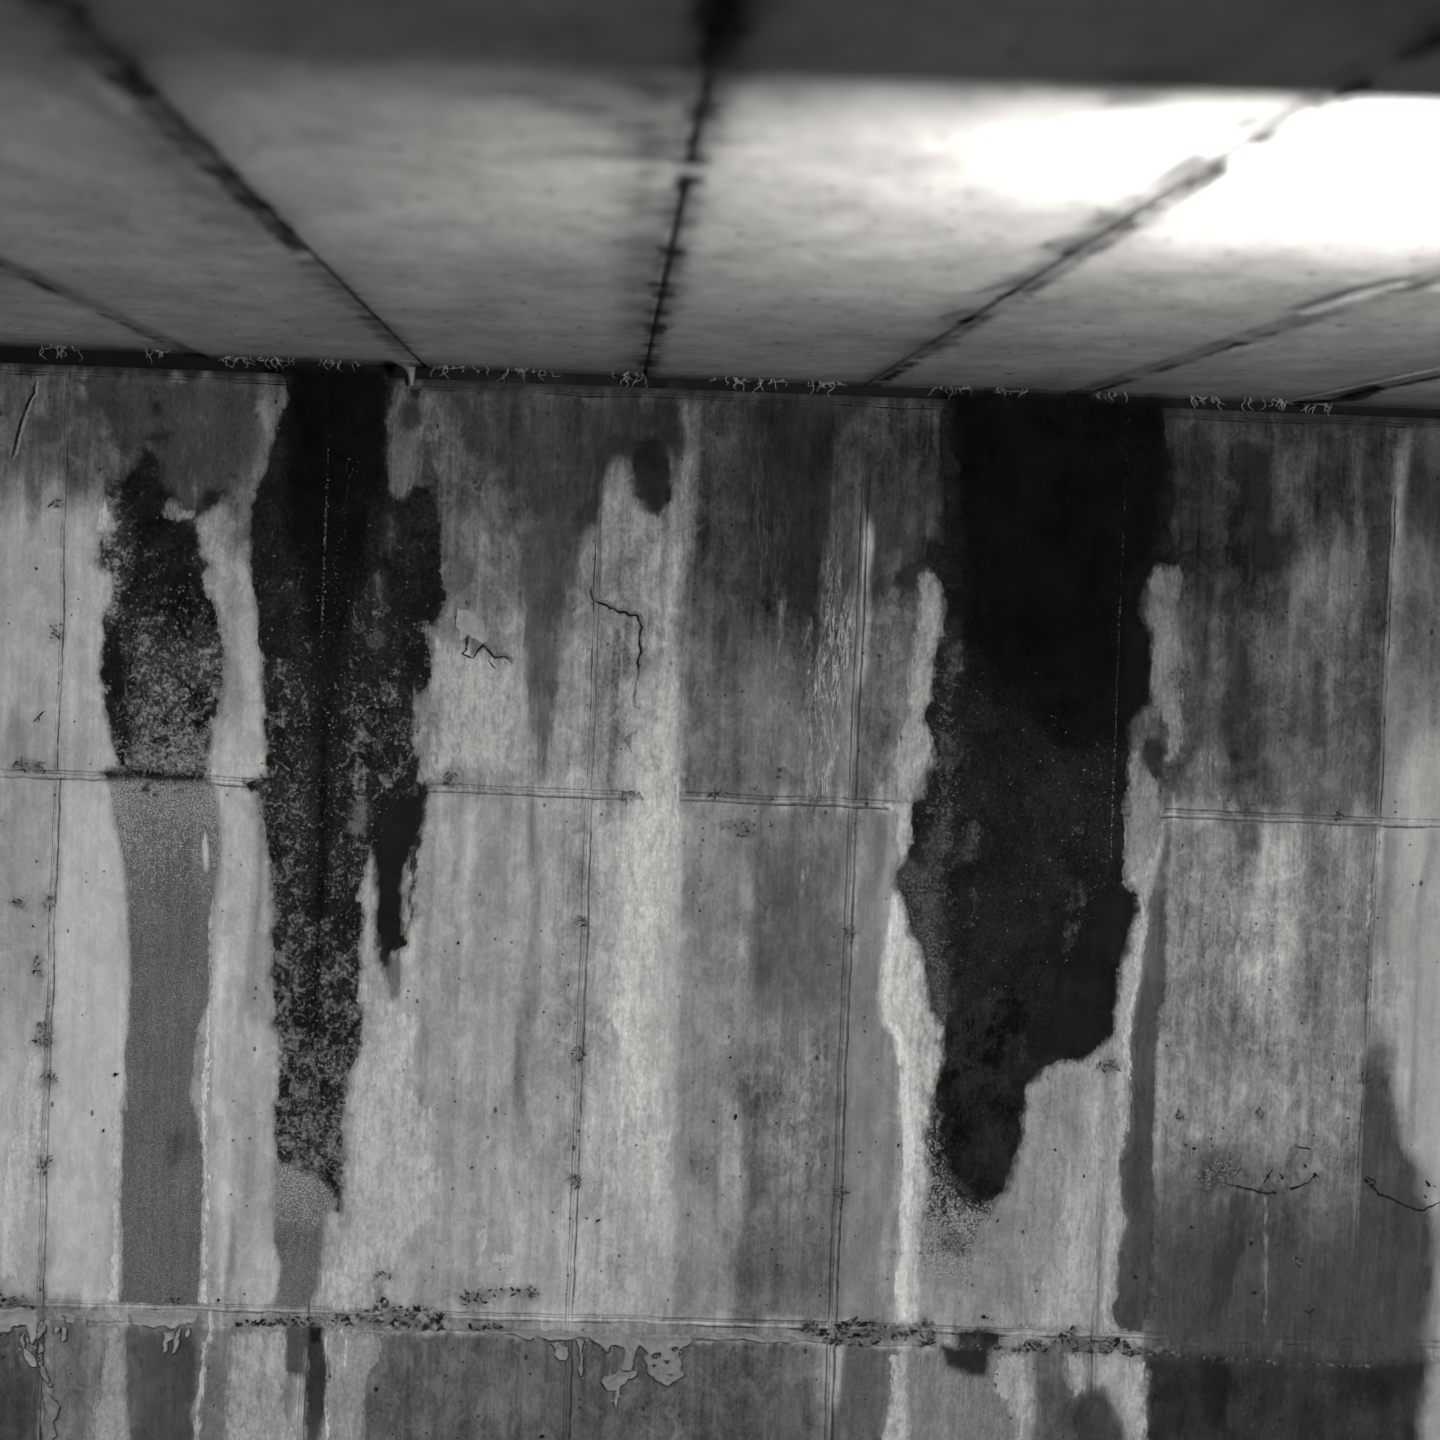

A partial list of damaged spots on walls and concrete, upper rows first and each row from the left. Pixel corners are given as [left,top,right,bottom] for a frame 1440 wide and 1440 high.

leakage [1385,375,1440,389]
peeling [456,608,488,644]
crack [590,585,654,770]
leakage [91,369,518,1440]
leakage [880,379,1435,1440]
crack [1225,1145,1320,1195]
crack [1364,1176,1440,1212]
peeling [130,1297,199,1354]
peeling [0,1307,94,1440]
peeling [508,1328,795,1410]